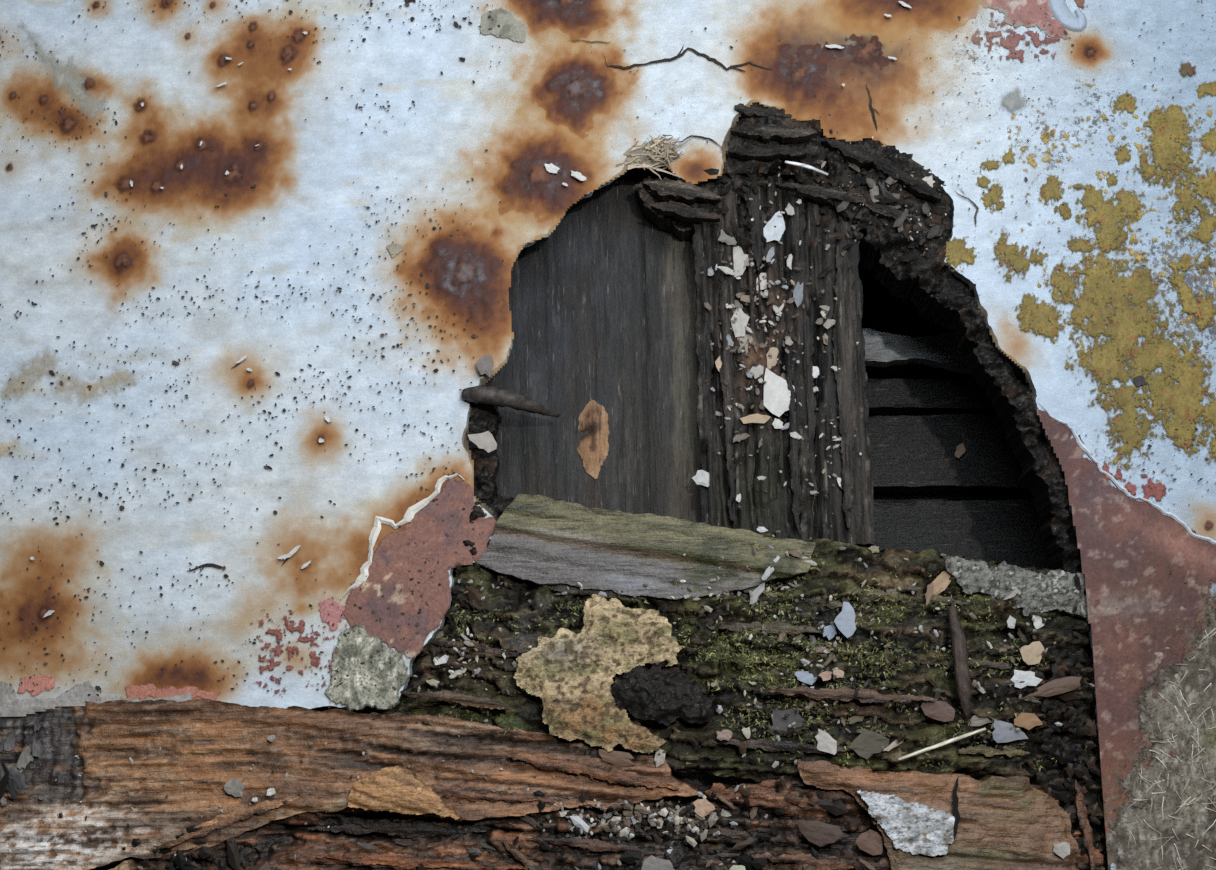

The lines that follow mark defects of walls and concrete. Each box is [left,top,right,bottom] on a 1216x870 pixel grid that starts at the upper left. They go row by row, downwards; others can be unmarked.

crack [571,40,773,72]
corrosion [736,0,981,146]
peeling [950,0,1081,80]
corrosion [1068,34,1111,68]
spalling [0,99,146,327]
corrosion [0,14,320,302]
corrosion [391,0,640,372]
peeling [0,180,497,700]
peeling [692,470,709,487]
peeling [740,347,796,429]
corrosion [0,530,101,683]
peeling [750,556,780,604]